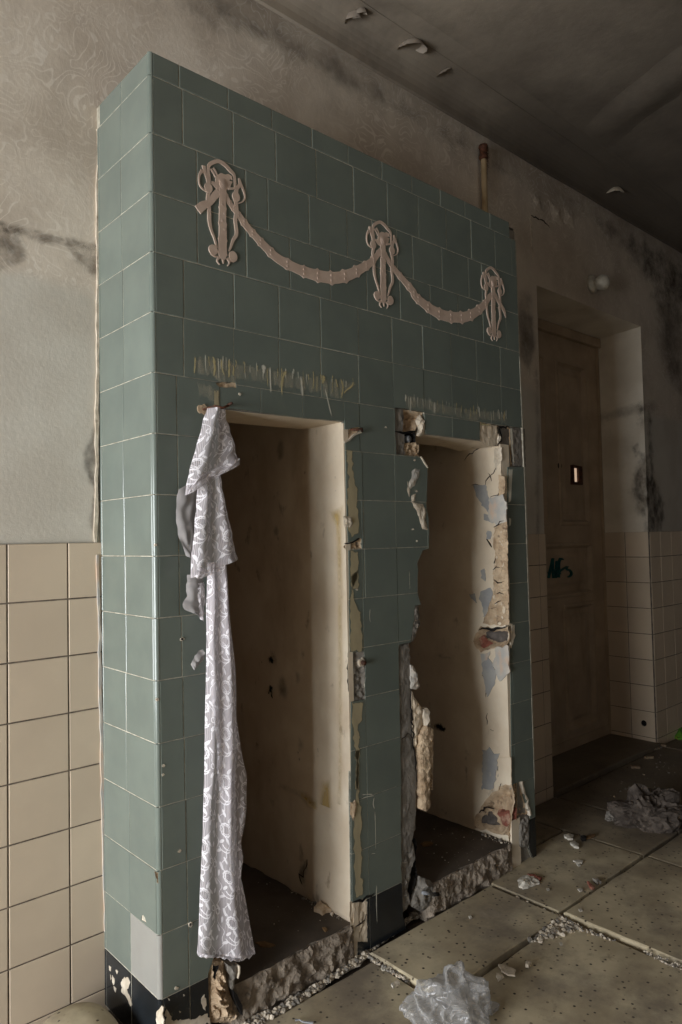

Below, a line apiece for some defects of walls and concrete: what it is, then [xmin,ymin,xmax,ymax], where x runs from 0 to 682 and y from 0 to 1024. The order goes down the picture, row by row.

peeling [398,38,427,53]
spalling [385,409,428,542]
peeling [469,422,526,697]
spalling [156,427,374,1024]
spalling [398,606,531,920]
peeling [109,966,132,1006]